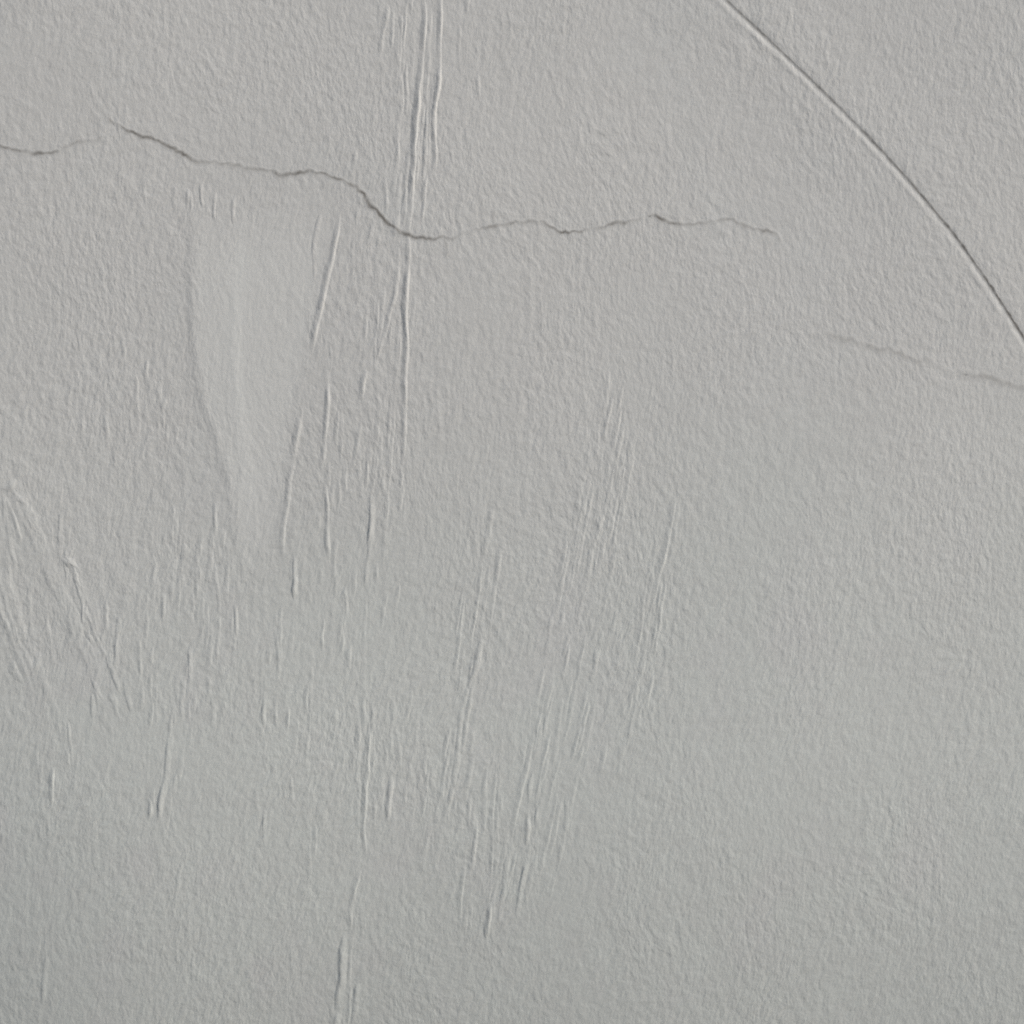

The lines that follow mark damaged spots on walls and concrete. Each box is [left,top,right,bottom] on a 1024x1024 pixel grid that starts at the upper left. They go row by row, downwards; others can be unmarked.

crack [0,117,783,256]